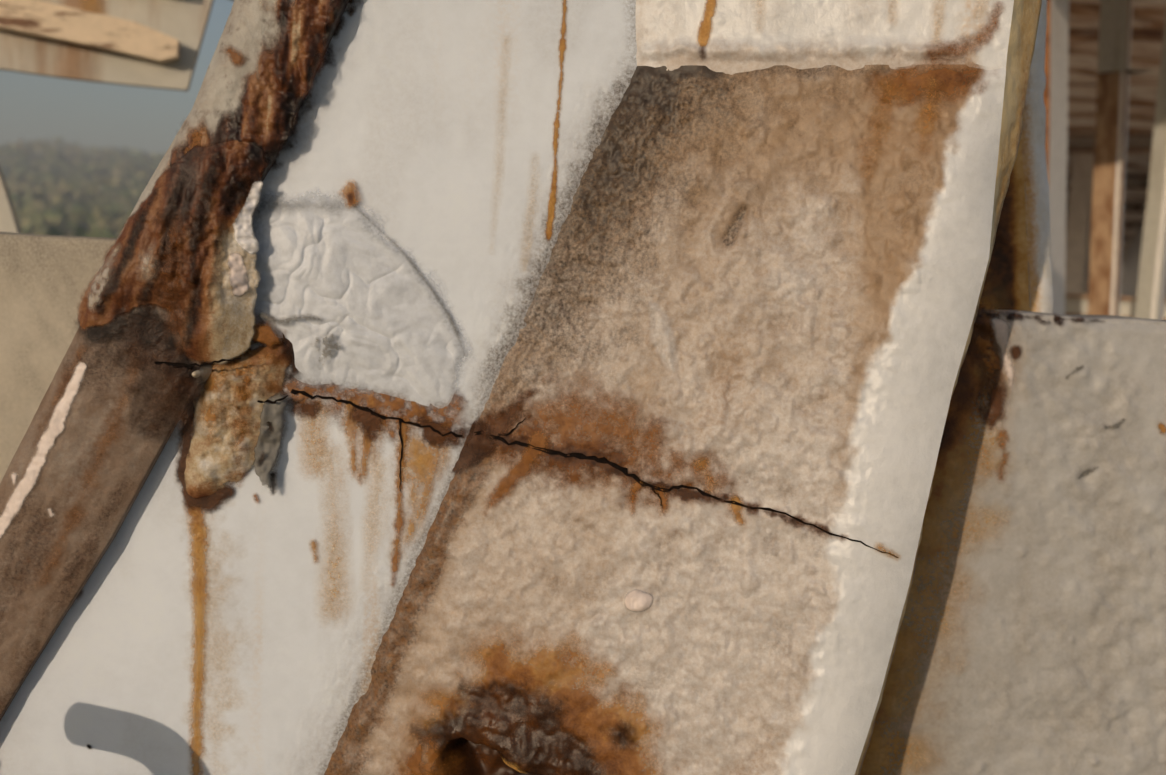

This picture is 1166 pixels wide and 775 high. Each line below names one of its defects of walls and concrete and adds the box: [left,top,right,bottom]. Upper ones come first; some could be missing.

rust [698,0,716,59]
peeling [228,182,262,296]
rust [342,182,359,207]
rust [545,0,567,240]
rust [154,322,844,775]
crack [290,389,897,558]
rust [860,299,1099,775]